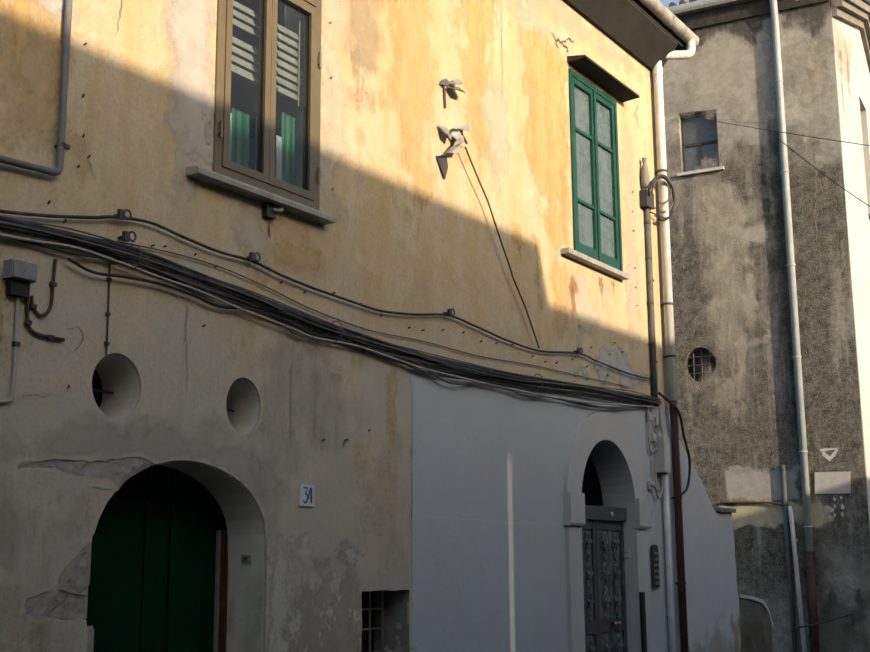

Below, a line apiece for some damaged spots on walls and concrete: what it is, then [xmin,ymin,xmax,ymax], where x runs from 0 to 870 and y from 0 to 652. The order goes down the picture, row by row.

water stain [391,0,434,207]
water stain [457,0,509,169]
water stain [518,0,570,245]
crack [553,34,575,53]
water stain [687,2,834,127]
water stain [533,234,599,339]
water stain [694,161,783,414]
spalling [18,457,154,488]